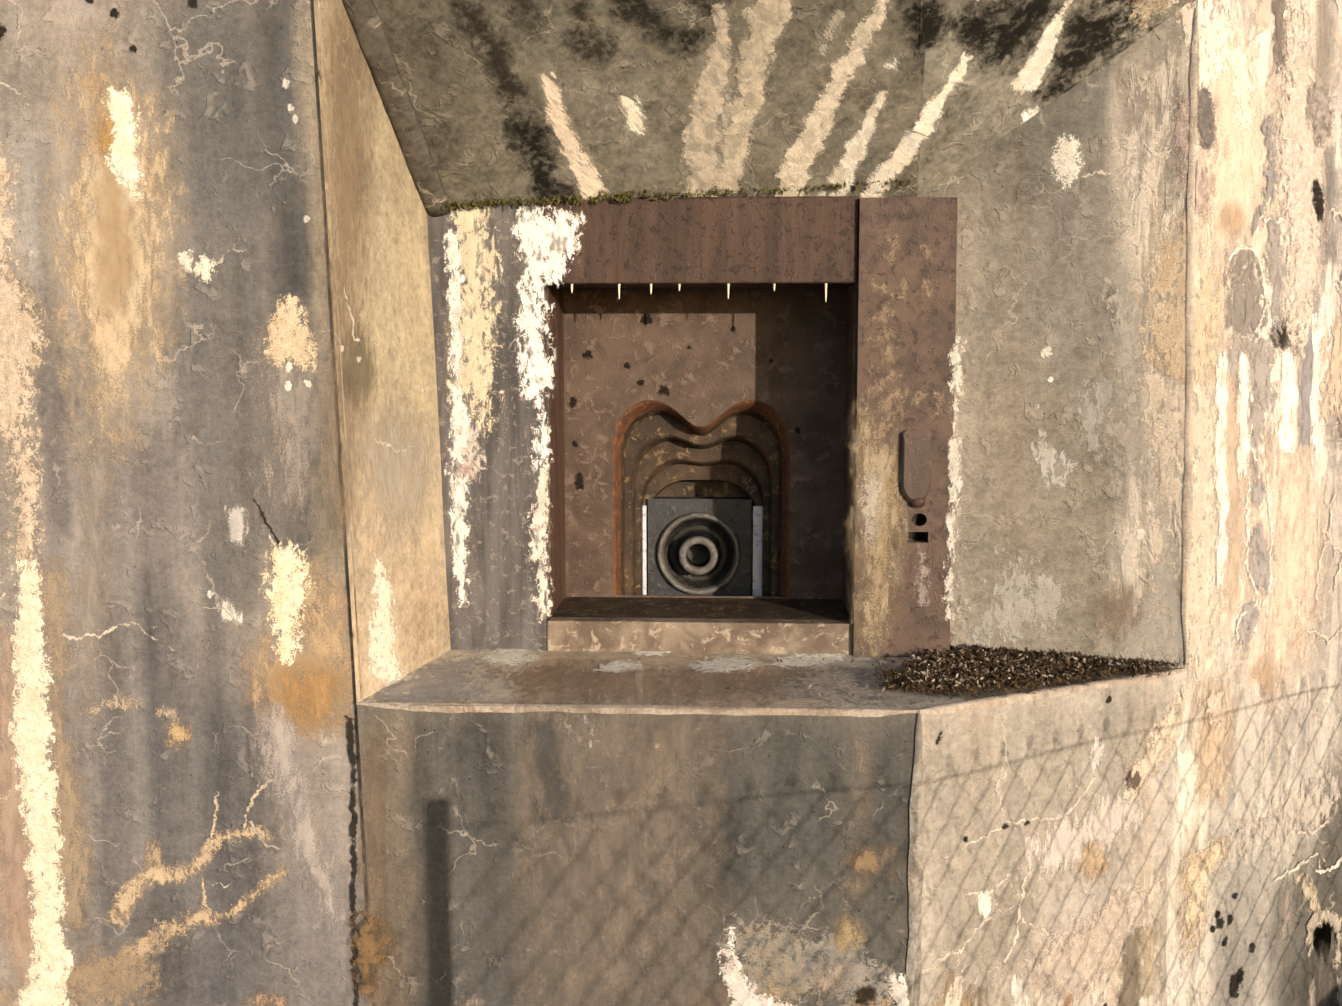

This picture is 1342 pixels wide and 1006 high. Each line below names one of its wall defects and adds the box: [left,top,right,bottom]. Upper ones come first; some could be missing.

water stain [450,0,616,201]
water stain [610,0,792,197]
water stain [773,0,1160,198]
peeling [443,204,587,622]
corrosion [574,472,584,490]
corrosion [612,362,801,597]
corrosion [850,400,931,657]
spalling [1128,0,1336,650]
crack [1307,494,1342,645]
crack [57,767,288,1006]
crack [345,715,360,1006]
spalling [702,910,917,1006]